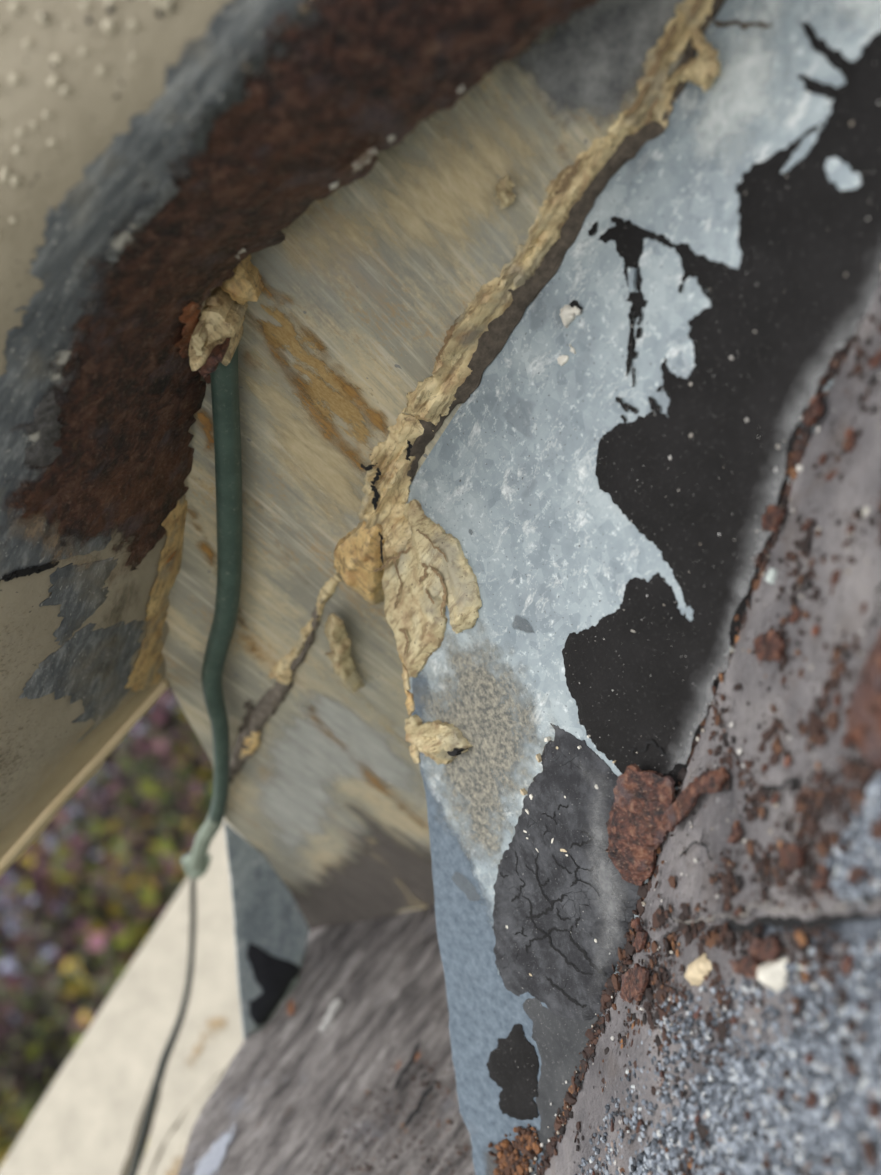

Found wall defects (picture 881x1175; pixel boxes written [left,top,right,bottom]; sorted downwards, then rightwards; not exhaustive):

peeling [781,123,825,174]
peeling [824,157,862,191]
corrosion [6,0,598,571]
peeling [627,267,639,293]
peeling [0,0,329,745]
peeling [765,568,778,585]
corrosion [754,630,788,662]
corrosion [846,631,881,768]
corrosion [605,764,676,886]
corrosion [846,867,872,883]
crack [499,804,617,1008]
corrosion [749,936,782,961]